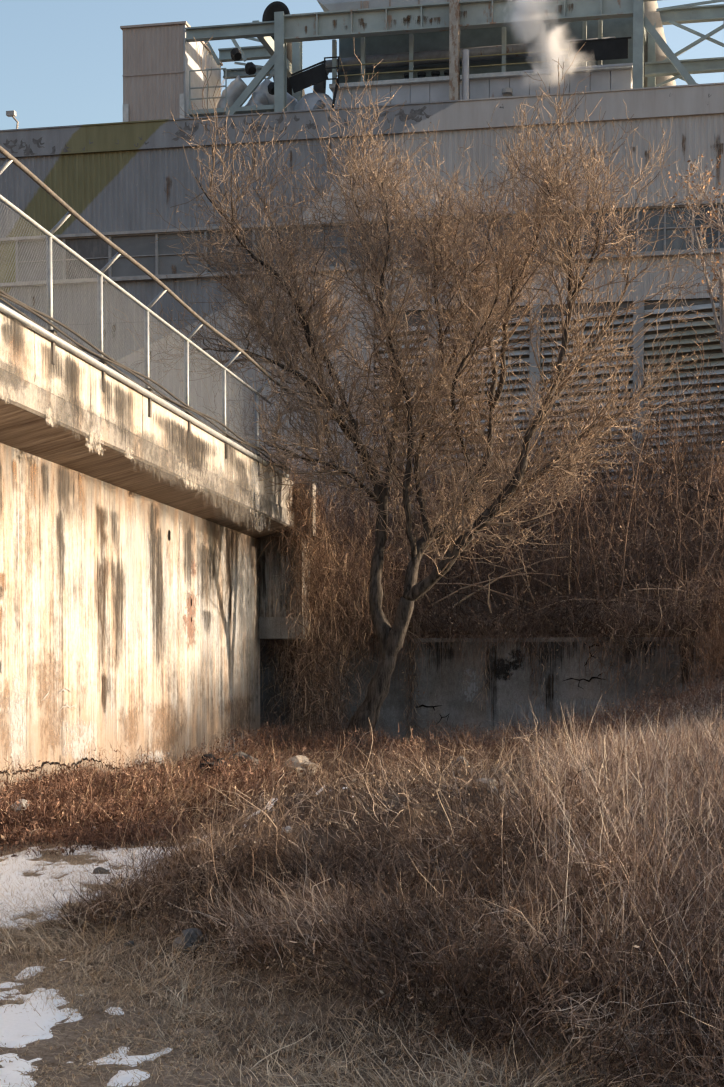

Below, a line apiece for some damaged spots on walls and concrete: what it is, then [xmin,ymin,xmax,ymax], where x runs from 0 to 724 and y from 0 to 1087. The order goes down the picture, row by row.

damp [5,315,26,357]
damp [45,343,79,407]
damp [96,379,132,434]
damp [159,416,258,496]
damp [42,464,75,596]
damp [96,503,294,712]
crack [416,704,450,723]
crack [564,644,601,689]
damp [508,642,658,733]
crack [0,755,171,783]